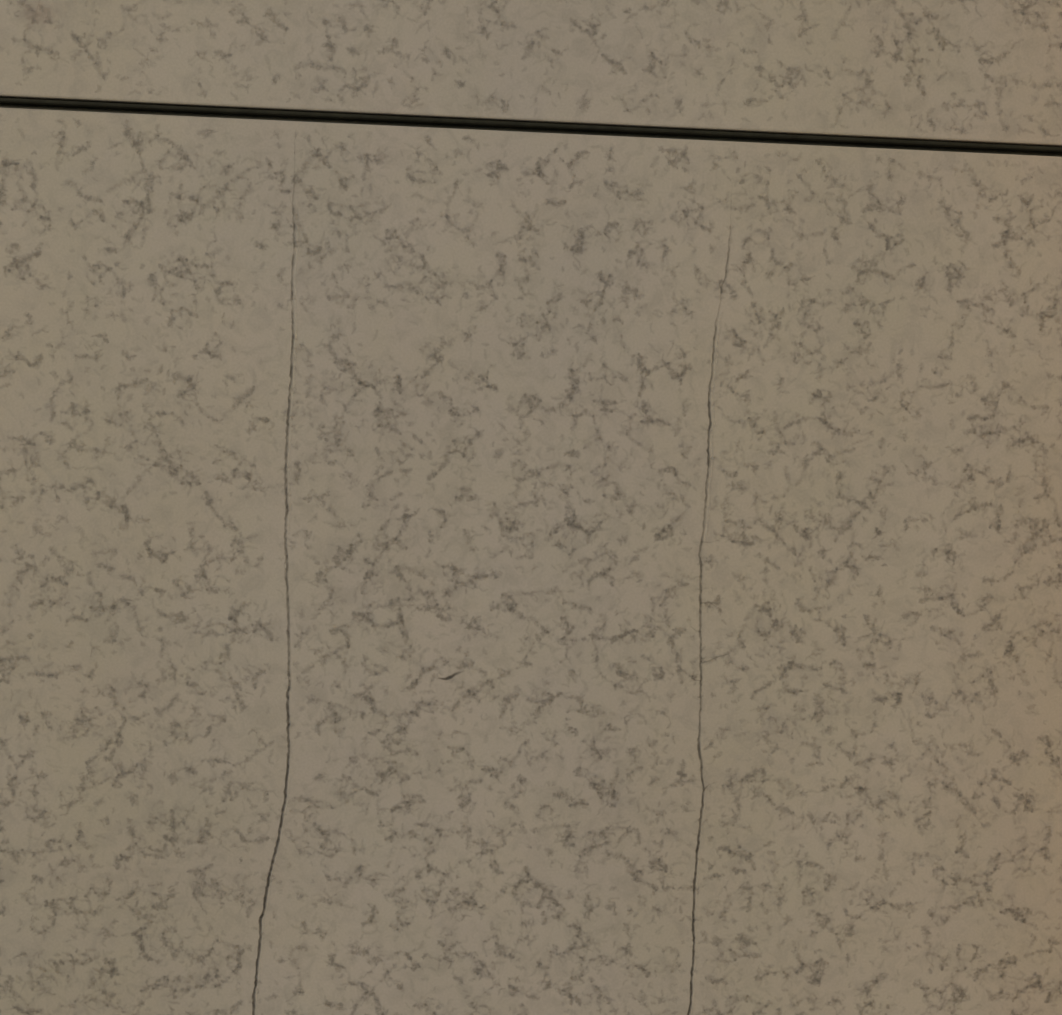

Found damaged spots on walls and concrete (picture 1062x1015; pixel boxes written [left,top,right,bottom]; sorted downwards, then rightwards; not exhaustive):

crack [705,336,715,493]
crack [252,673,290,1015]
crack [687,739,704,1015]